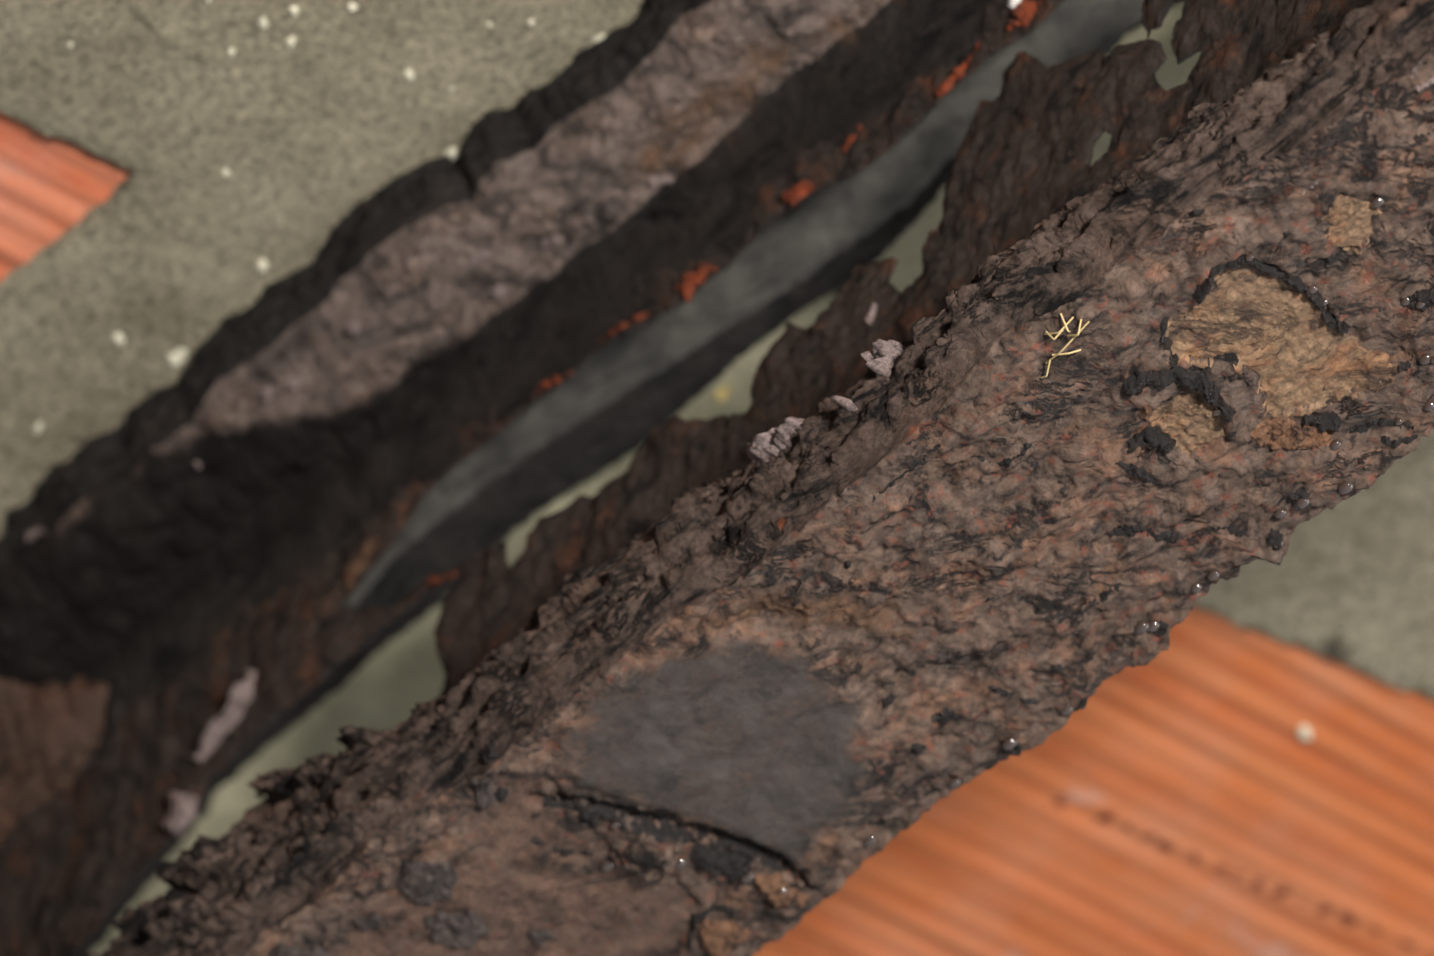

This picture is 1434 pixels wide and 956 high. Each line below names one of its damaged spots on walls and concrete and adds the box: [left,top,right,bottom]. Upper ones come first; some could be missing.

rust [1006,0,1043,32]
spalling [445,147,462,160]
rust [782,179,815,207]
rust [1321,194,1384,255]
spalling [1399,287,1434,312]
spalling [167,348,187,366]
rust [861,339,906,377]
rust [1122,255,1400,458]
rust [0,339,469,691]
spalling [1265,528,1284,550]
spalling [1152,621,1169,637]
spalling [932,707,959,725]